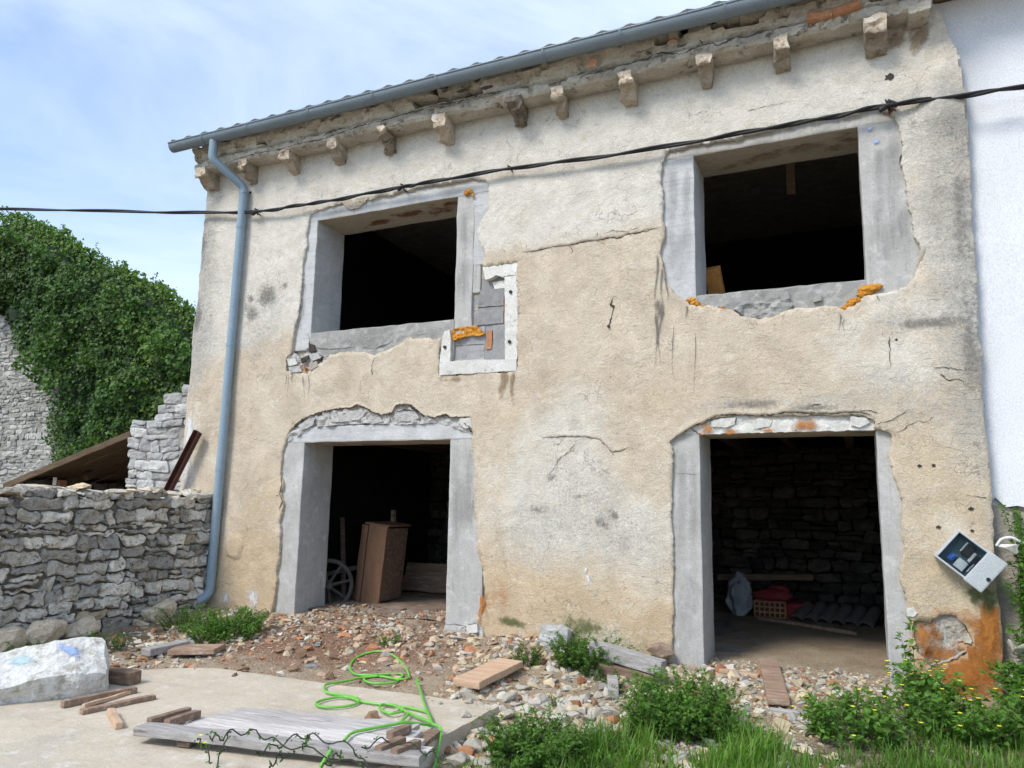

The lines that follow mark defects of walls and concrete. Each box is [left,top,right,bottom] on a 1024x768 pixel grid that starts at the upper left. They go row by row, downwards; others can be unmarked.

crack [519,219,661,253]
water stain [654,258,668,344]
spalling [734,292,793,319]
flaking render [287,405,472,442]
peeling [699,416,875,435]
crack [667,404,933,443]
crack [542,430,629,477]
flaking render [906,607,972,684]
corrosion [909,603,1002,692]